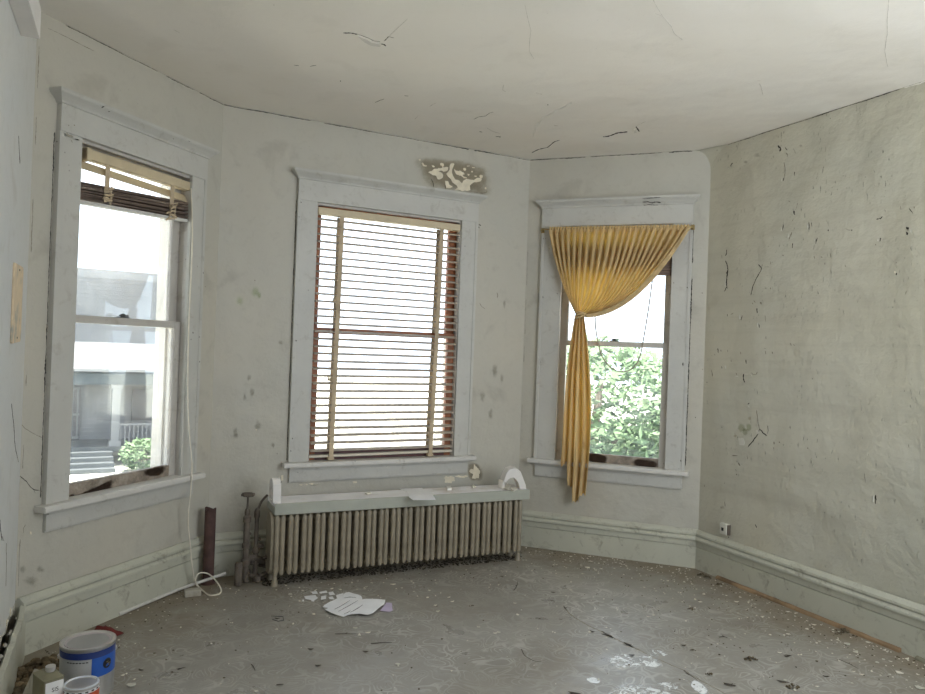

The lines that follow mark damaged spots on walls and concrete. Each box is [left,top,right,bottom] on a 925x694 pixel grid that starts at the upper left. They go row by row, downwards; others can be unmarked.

crack [345,20,406,47]
crack [48,25,692,160]
peeling [419,159,487,193]
crack [738,410,769,447]
crack [11,404,42,492]